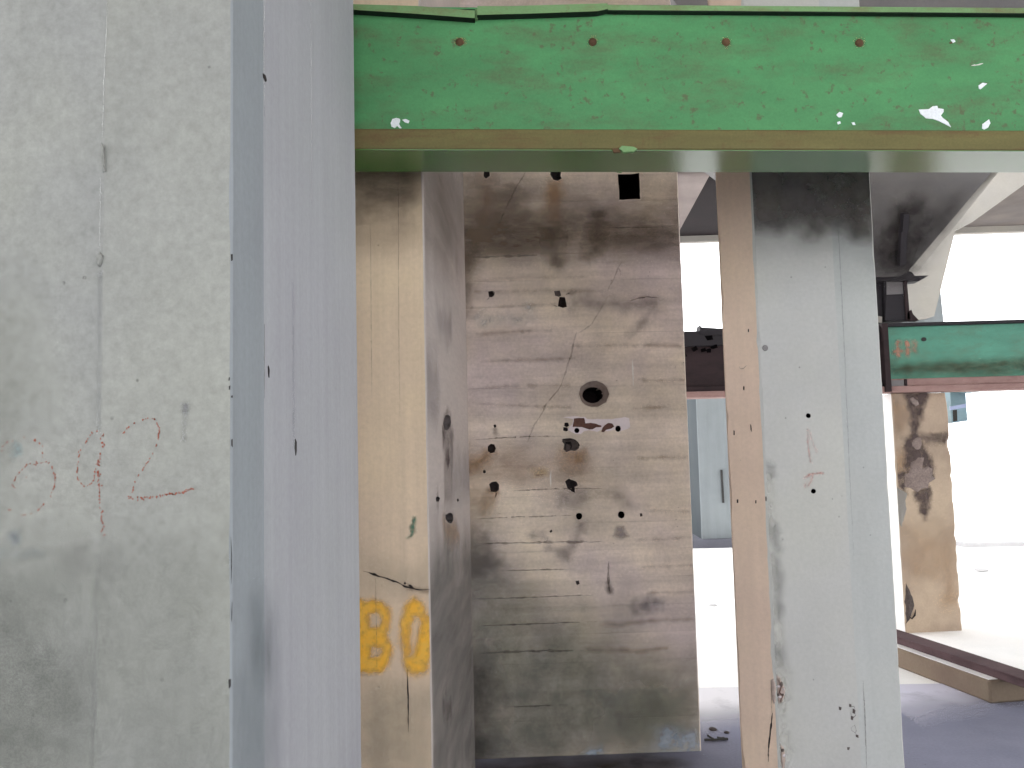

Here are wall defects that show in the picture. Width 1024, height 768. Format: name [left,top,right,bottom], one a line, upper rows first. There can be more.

peeling [919,106,951,127]
spalling [562,418,614,459]
damp [897,392,947,516]
crack [363,571,430,590]
damp [477,751,675,768]